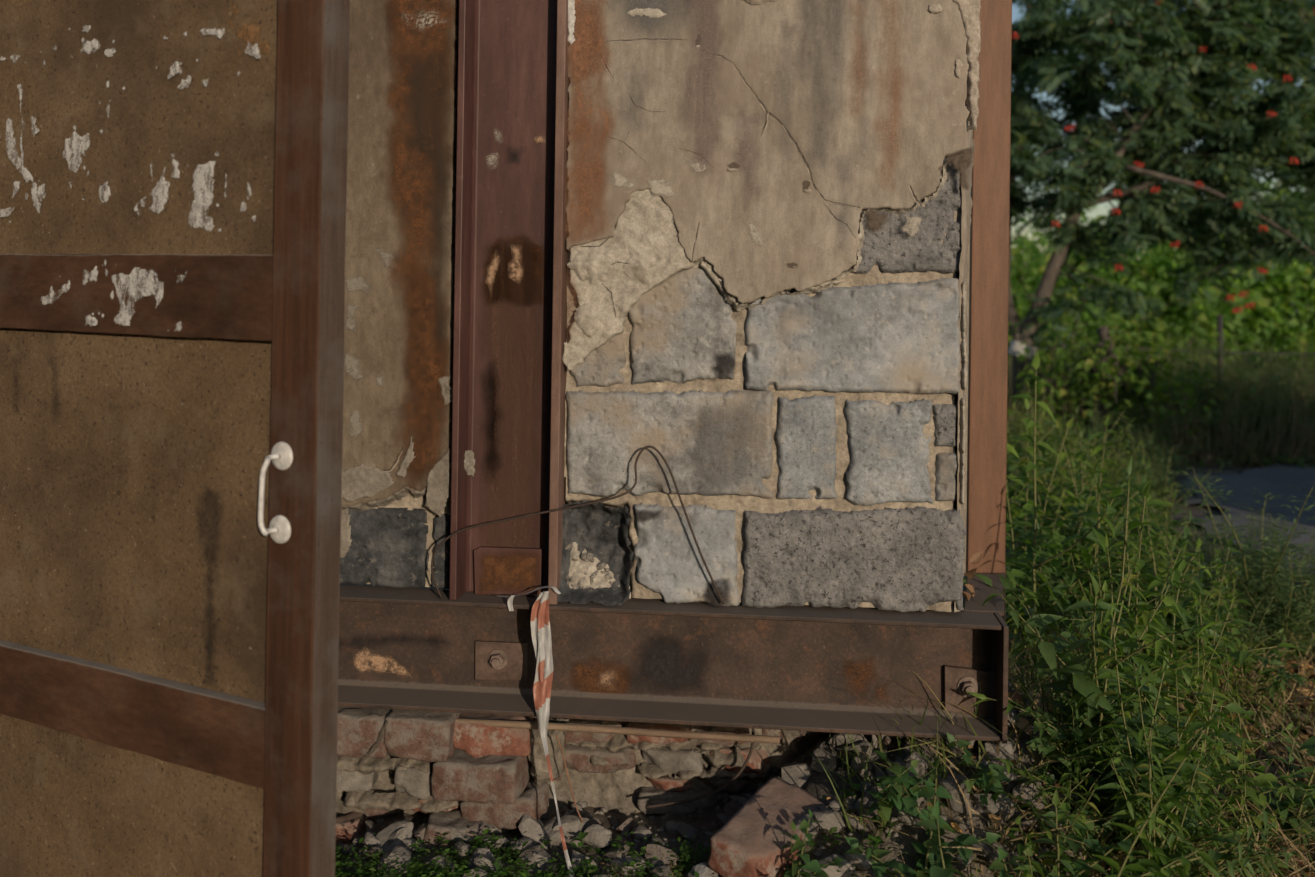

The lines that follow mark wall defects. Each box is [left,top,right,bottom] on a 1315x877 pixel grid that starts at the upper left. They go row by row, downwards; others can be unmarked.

crack [601,38,685,112]
peeling [0,84,45,217]
peeling [63,81,125,188]
peeling [41,260,164,326]
peeling [134,153,227,231]
corrosion [389,0,453,476]
flaking render [562,161,952,371]
crack [714,54,860,238]
spalling [340,437,475,558]
spalling [558,500,634,606]
corrosion [355,651,406,674]
corrosion [574,665,629,694]